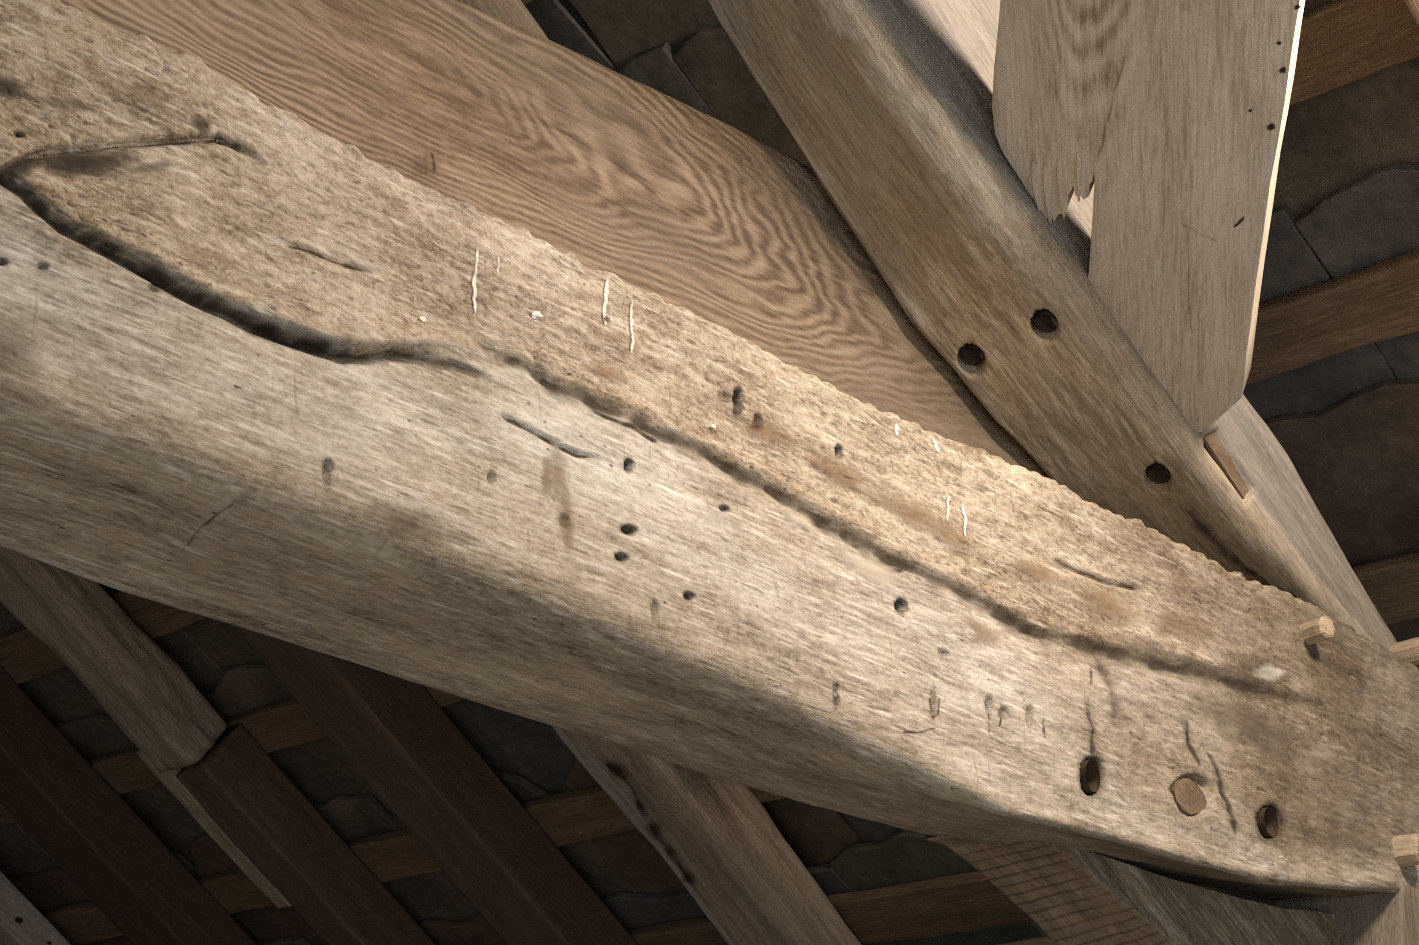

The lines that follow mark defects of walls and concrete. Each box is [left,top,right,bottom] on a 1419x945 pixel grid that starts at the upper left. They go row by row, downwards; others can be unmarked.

crack [0,138,418,362]
crack [482,346,916,572]
crack [187,503,234,545]
crack [1059,562,1135,589]
crack [952,586,1259,692]
crack [1087,712,1095,753]
crack [1186,732,1236,830]